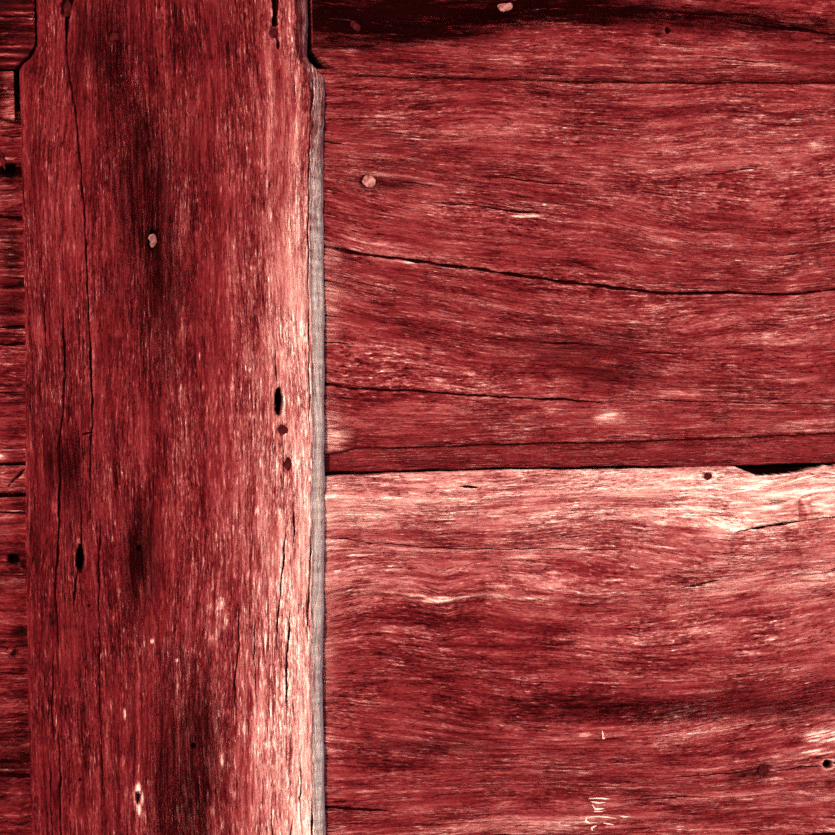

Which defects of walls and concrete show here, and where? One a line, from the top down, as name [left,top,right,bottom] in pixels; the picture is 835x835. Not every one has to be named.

crack [294,65,835,441]
crack [0,0,104,835]
crack [271,741,393,835]
crack [654,771,744,800]
crack [790,827,835,835]